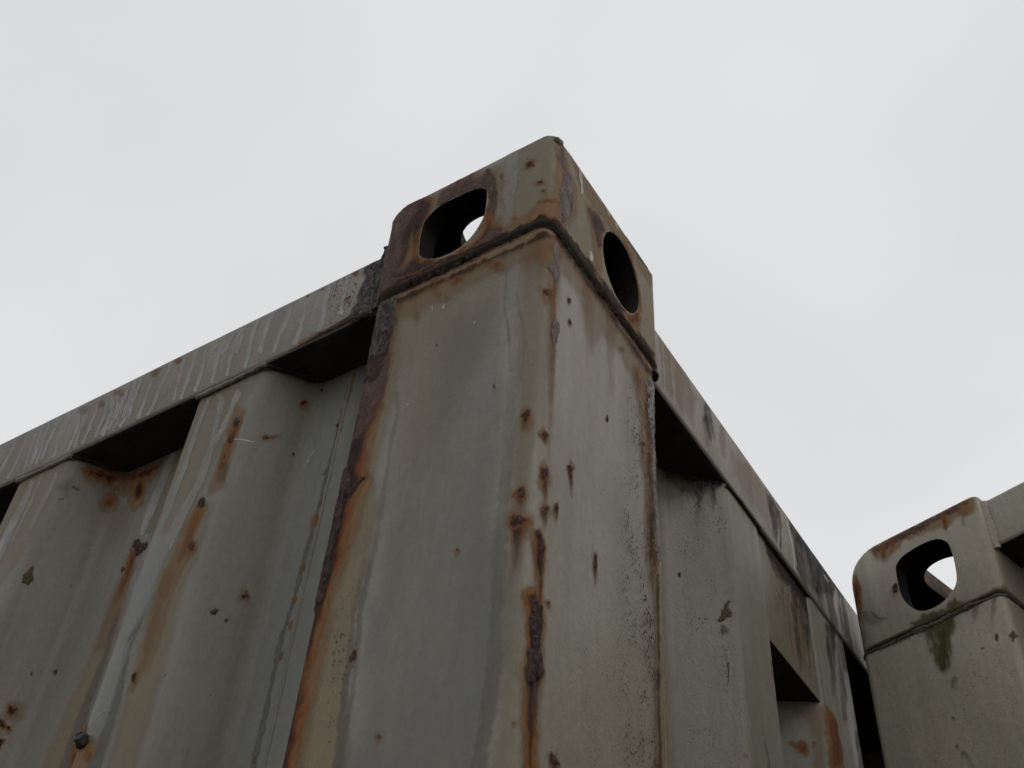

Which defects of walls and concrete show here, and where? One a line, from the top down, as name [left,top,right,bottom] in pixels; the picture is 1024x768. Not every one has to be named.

rust [84,463,161,512]
rust [110,406,245,768]
rust [251,455,332,768]
rust [282,137,655,768]
rust [871,499,974,558]